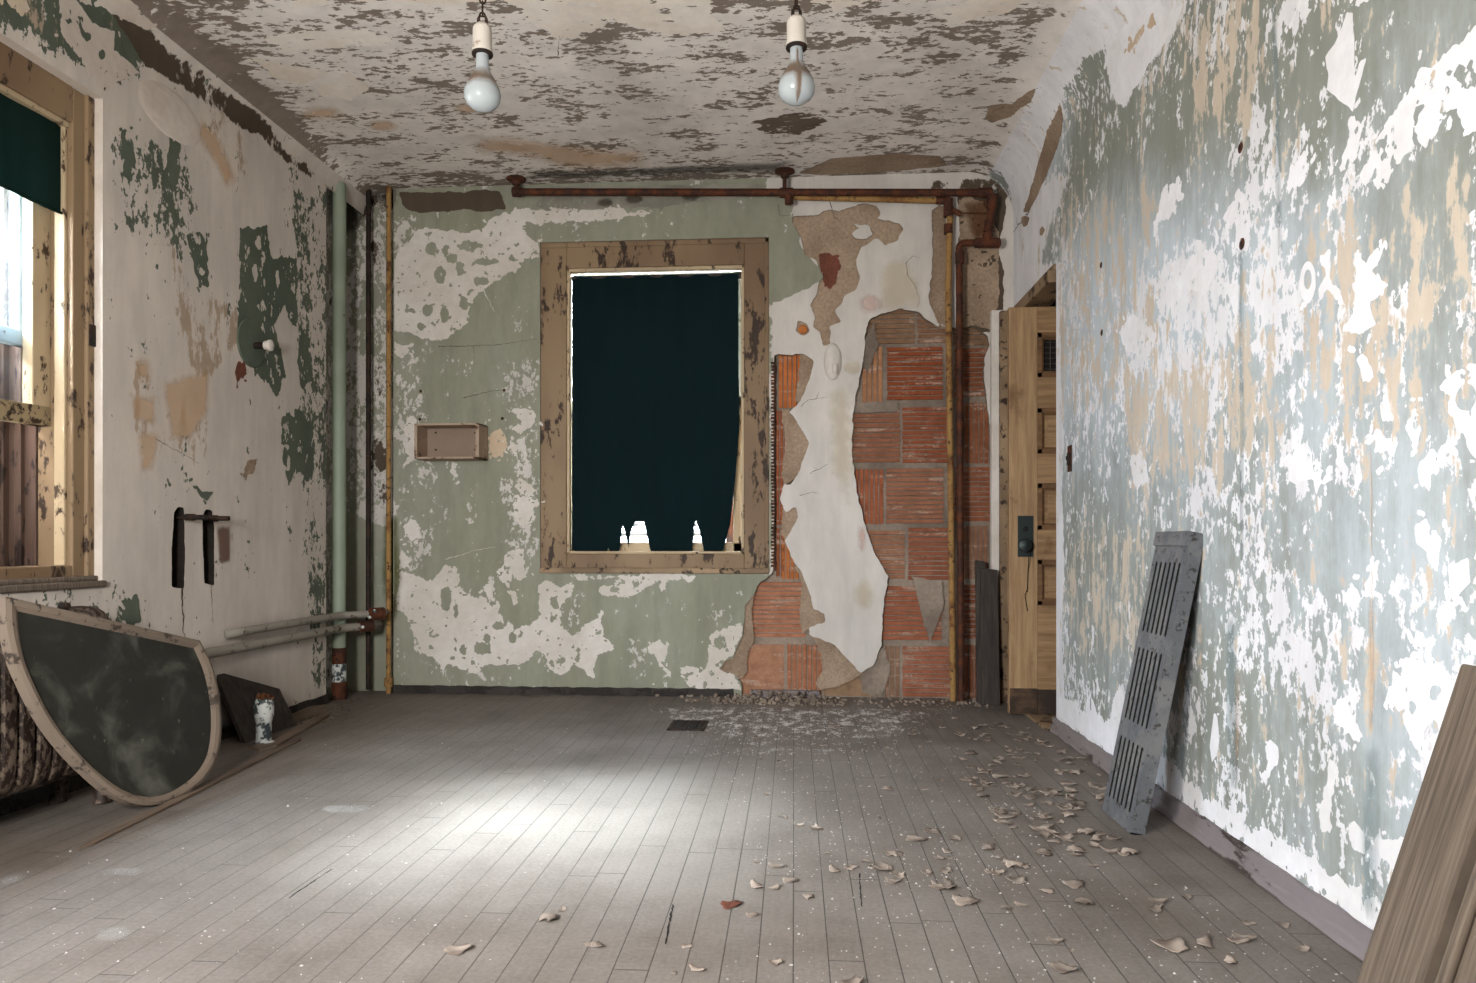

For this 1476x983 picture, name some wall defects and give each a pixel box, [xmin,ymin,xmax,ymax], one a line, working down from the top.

peeling [55,0,166,89]
spalling [800,153,947,175]
peeling [1104,0,1184,106]
peeling [1322,0,1476,190]
peeling [235,225,317,485]
peeling [394,183,765,358]
peeling [1300,236,1388,382]
flaking render [645,197,1000,748]
peeling [396,473,696,678]
peeling [1058,684,1125,755]
peeling [1383,629,1454,770]
peeling [1155,749,1404,930]